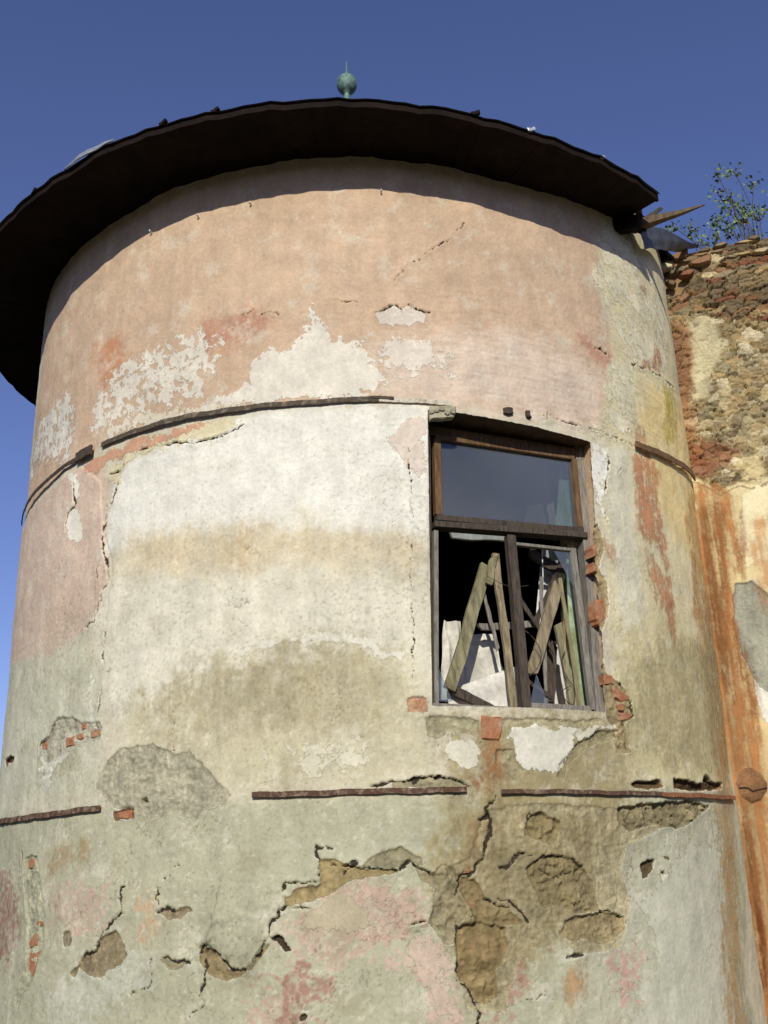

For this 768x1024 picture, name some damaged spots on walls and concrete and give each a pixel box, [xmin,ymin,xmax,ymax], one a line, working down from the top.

crack [341,223,464,314]
peeling [28,303,457,542]
peeling [584,223,669,634]
crack [87,424,244,727]
corrosion [634,453,675,642]
spalling [37,665,102,792]
peeling [392,660,635,789]
corrosion [685,483,768,1024]
spalling [70,930,127,979]
spalling [200,935,291,981]
spalling [283,801,743,1024]
crack [454,796,582,1024]